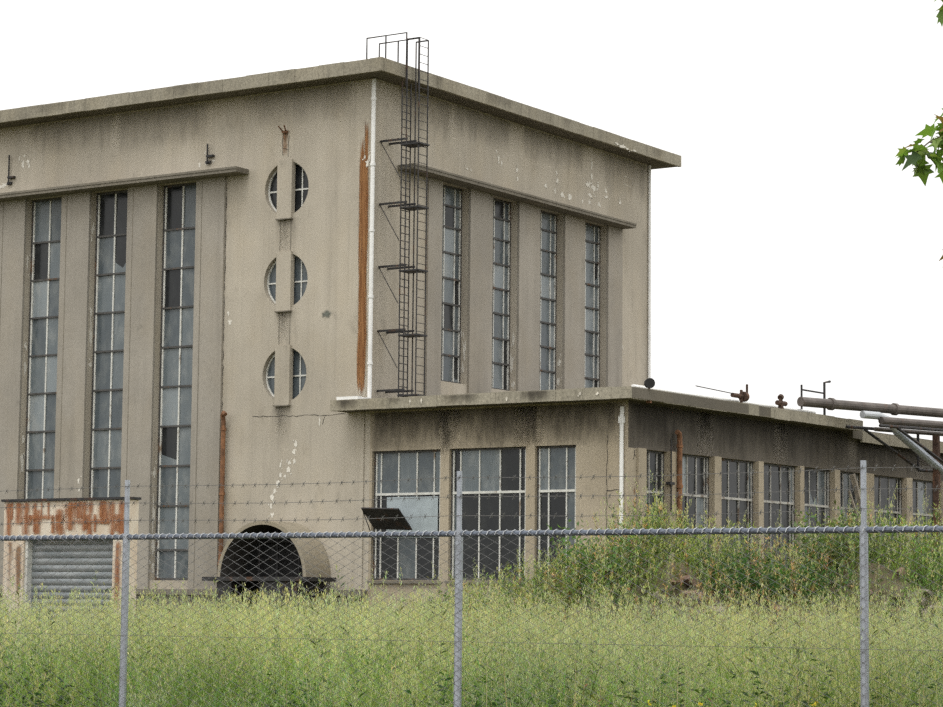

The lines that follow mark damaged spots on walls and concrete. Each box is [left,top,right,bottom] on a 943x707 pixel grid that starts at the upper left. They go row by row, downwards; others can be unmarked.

peeling [544,158,608,207]
corrosion [357,126,368,392]
peeling [268,439,297,517]
corrosion [6,501,125,609]